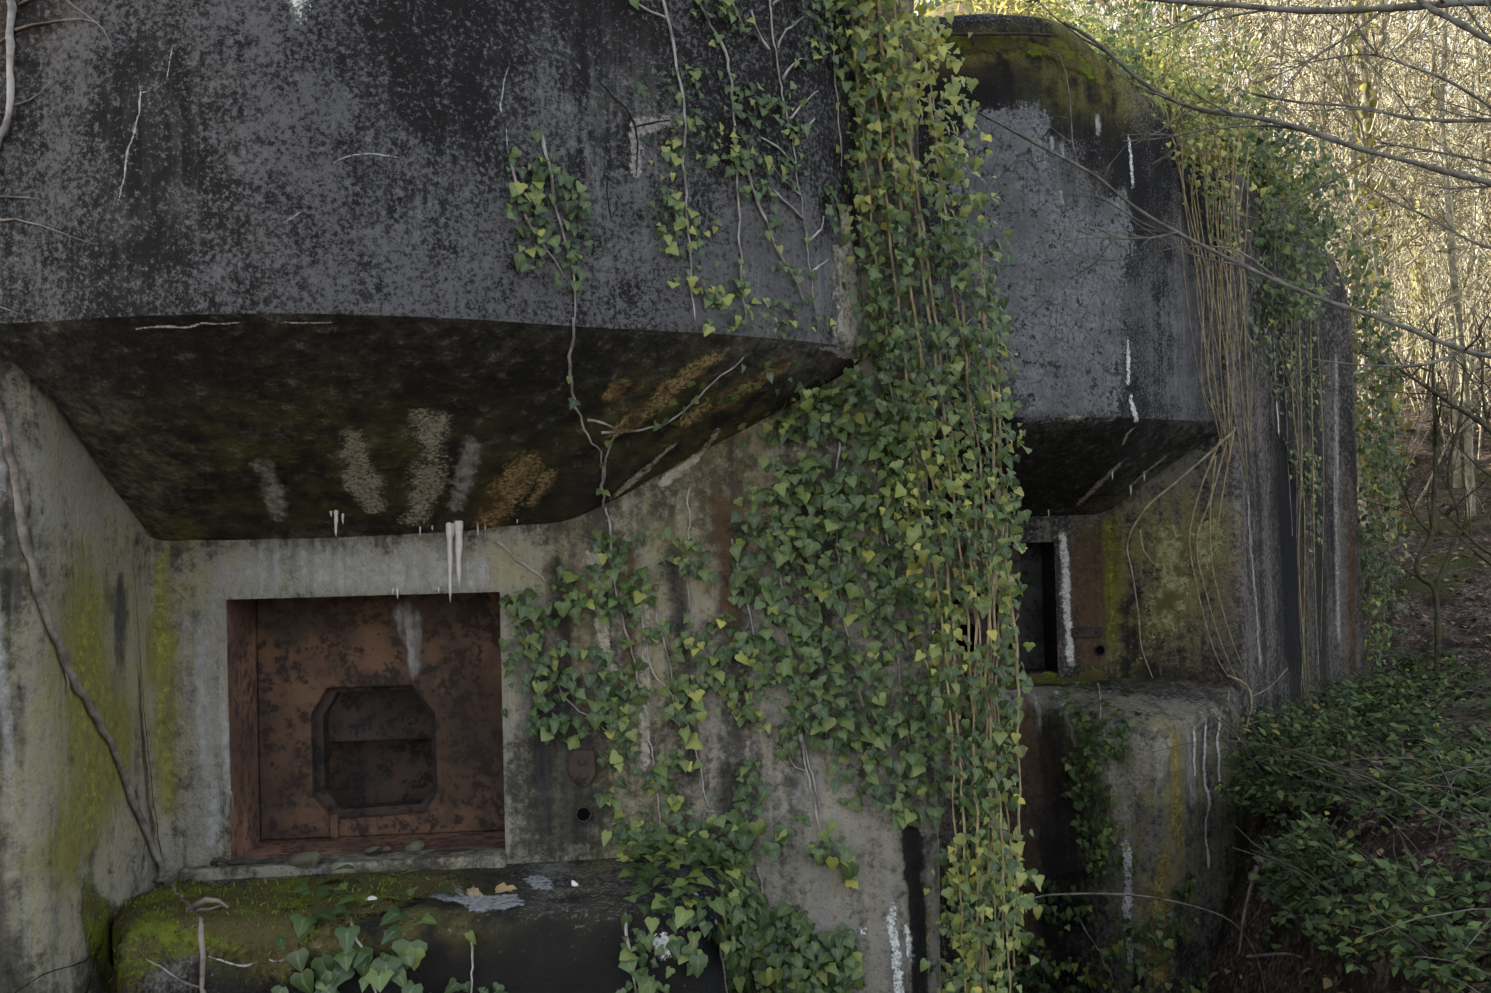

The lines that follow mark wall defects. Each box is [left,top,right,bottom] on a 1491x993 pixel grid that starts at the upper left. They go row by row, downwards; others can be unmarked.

water stain [139,562,174,828]
water stain [302,551,485,589]
water stain [1272,401,1304,668]
water stain [1102,723,1221,964]